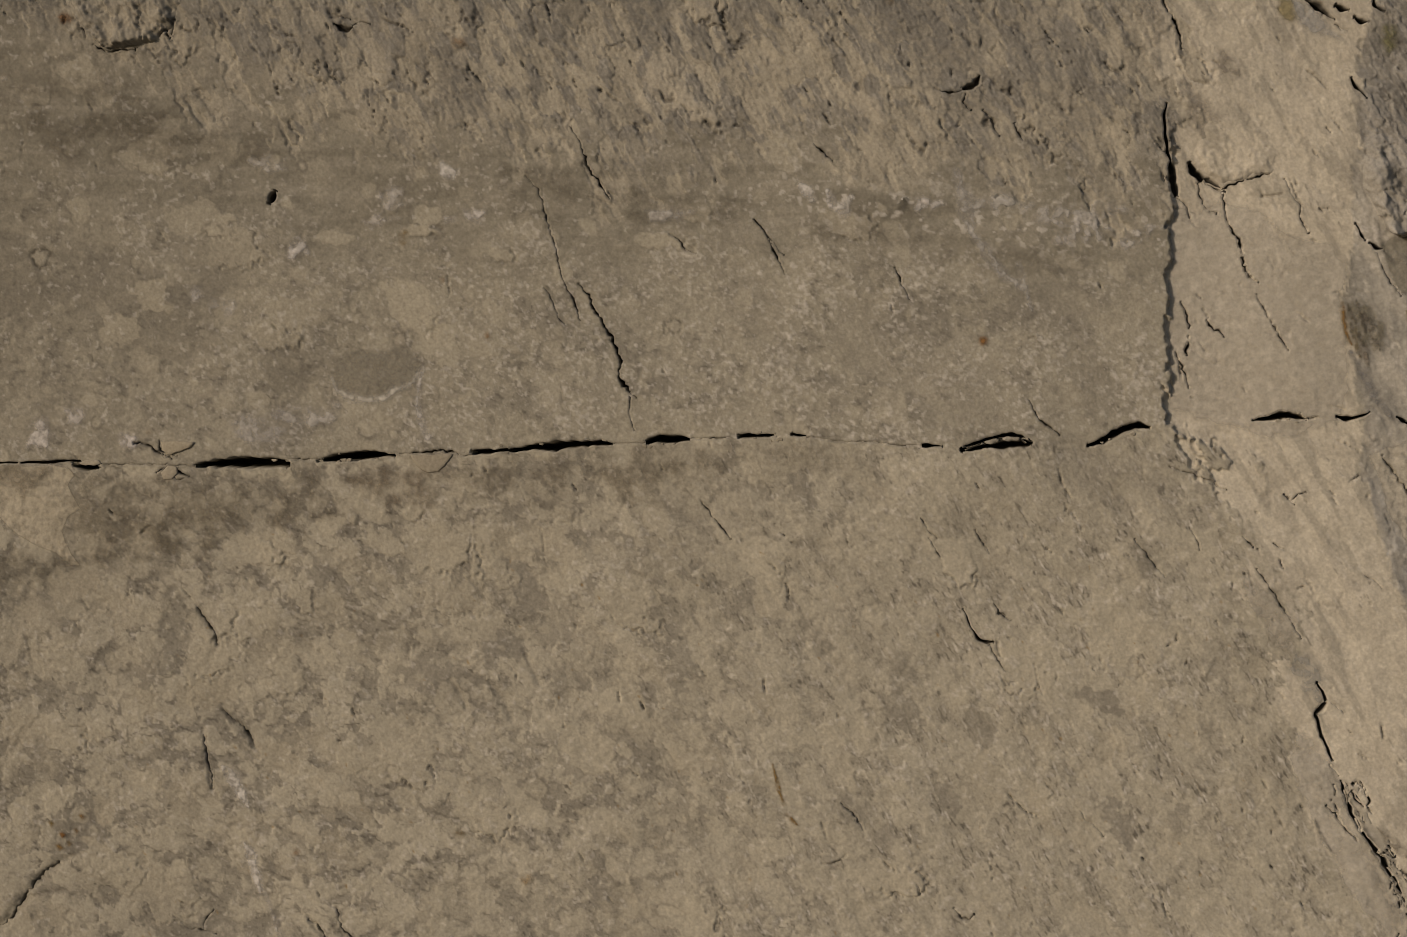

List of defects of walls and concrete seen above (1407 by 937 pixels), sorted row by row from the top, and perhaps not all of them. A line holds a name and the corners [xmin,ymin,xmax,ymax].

crack [1348,77,1369,99]
crack [1161,103,1311,350]
crack [1353,223,1403,297]
crack [0,174,1150,483]
crack [1173,302,1225,399]
crack [1251,410,1407,427]
crack [1169,464,1227,491]
crack [1381,454,1407,494]
crack [1133,538,1167,579]
crack [1241,535,1303,639]
crack [1311,682,1407,937]
crack [0,860,60,928]